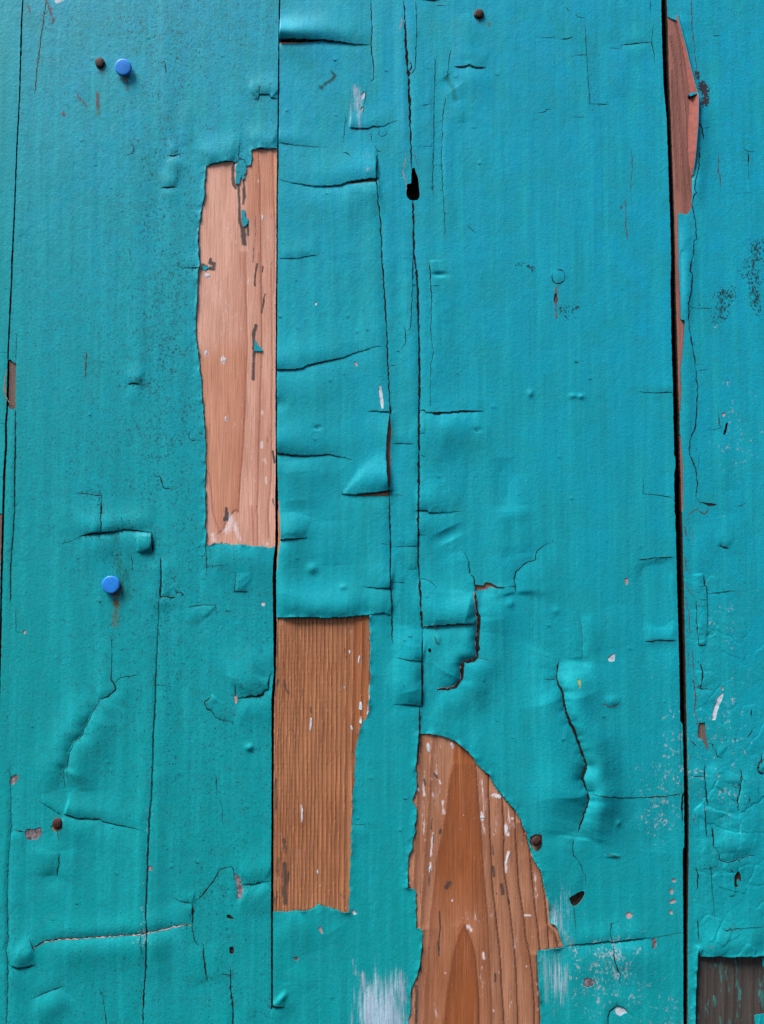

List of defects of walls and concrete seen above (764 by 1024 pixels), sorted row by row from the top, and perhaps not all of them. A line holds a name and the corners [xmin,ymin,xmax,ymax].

crack [5,493,272,1024]
peeling [196,149,392,915]
crack [280,0,488,764]
peeling [408,733,564,1024]
crack [547,107,763,1018]
peeling [664,15,700,513]